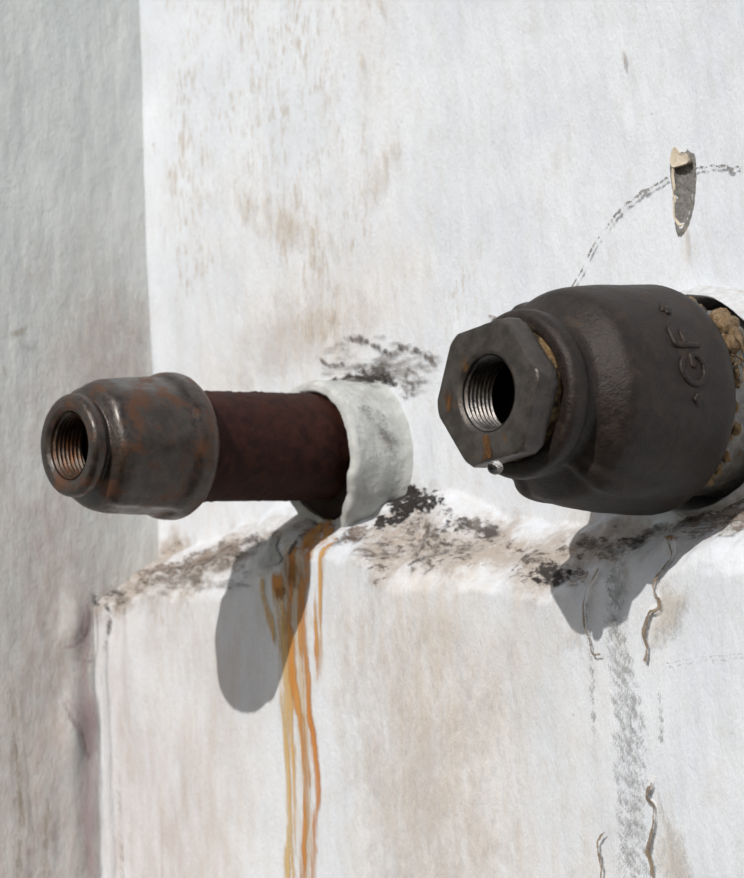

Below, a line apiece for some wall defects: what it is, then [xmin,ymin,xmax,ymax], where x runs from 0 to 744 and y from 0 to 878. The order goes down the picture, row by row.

crack [571,177,668,287]
spalling [670,147,697,237]
crack [693,164,742,172]
water stain [320,335,436,398]
water stain [337,484,504,570]
water stain [522,554,588,587]
peeling [582,568,600,656]
peeling [640,539,683,664]
corrosion [261,520,336,878]
water stain [576,498,744,878]
peeling [645,773,687,878]